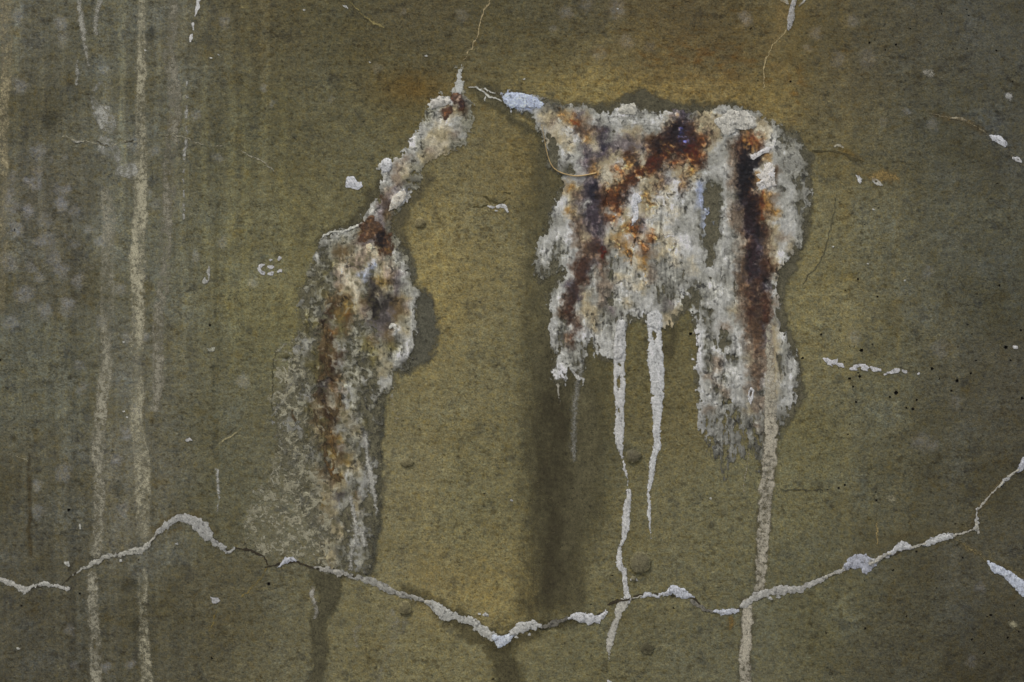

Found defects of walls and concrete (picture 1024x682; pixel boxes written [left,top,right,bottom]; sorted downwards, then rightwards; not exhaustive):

leakage [0,0,12,246]
efflorescence [75,0,102,85]
rust [442,93,465,120]
efflorescence [91,0,188,557]
rust [309,325,342,482]
rust [358,215,395,256]
leakage [244,64,815,682]
rust [550,108,717,351]
rust [727,129,774,398]
efflorescence [87,571,102,682]
efflorescence [140,628,153,682]
crack [0,457,1024,648]